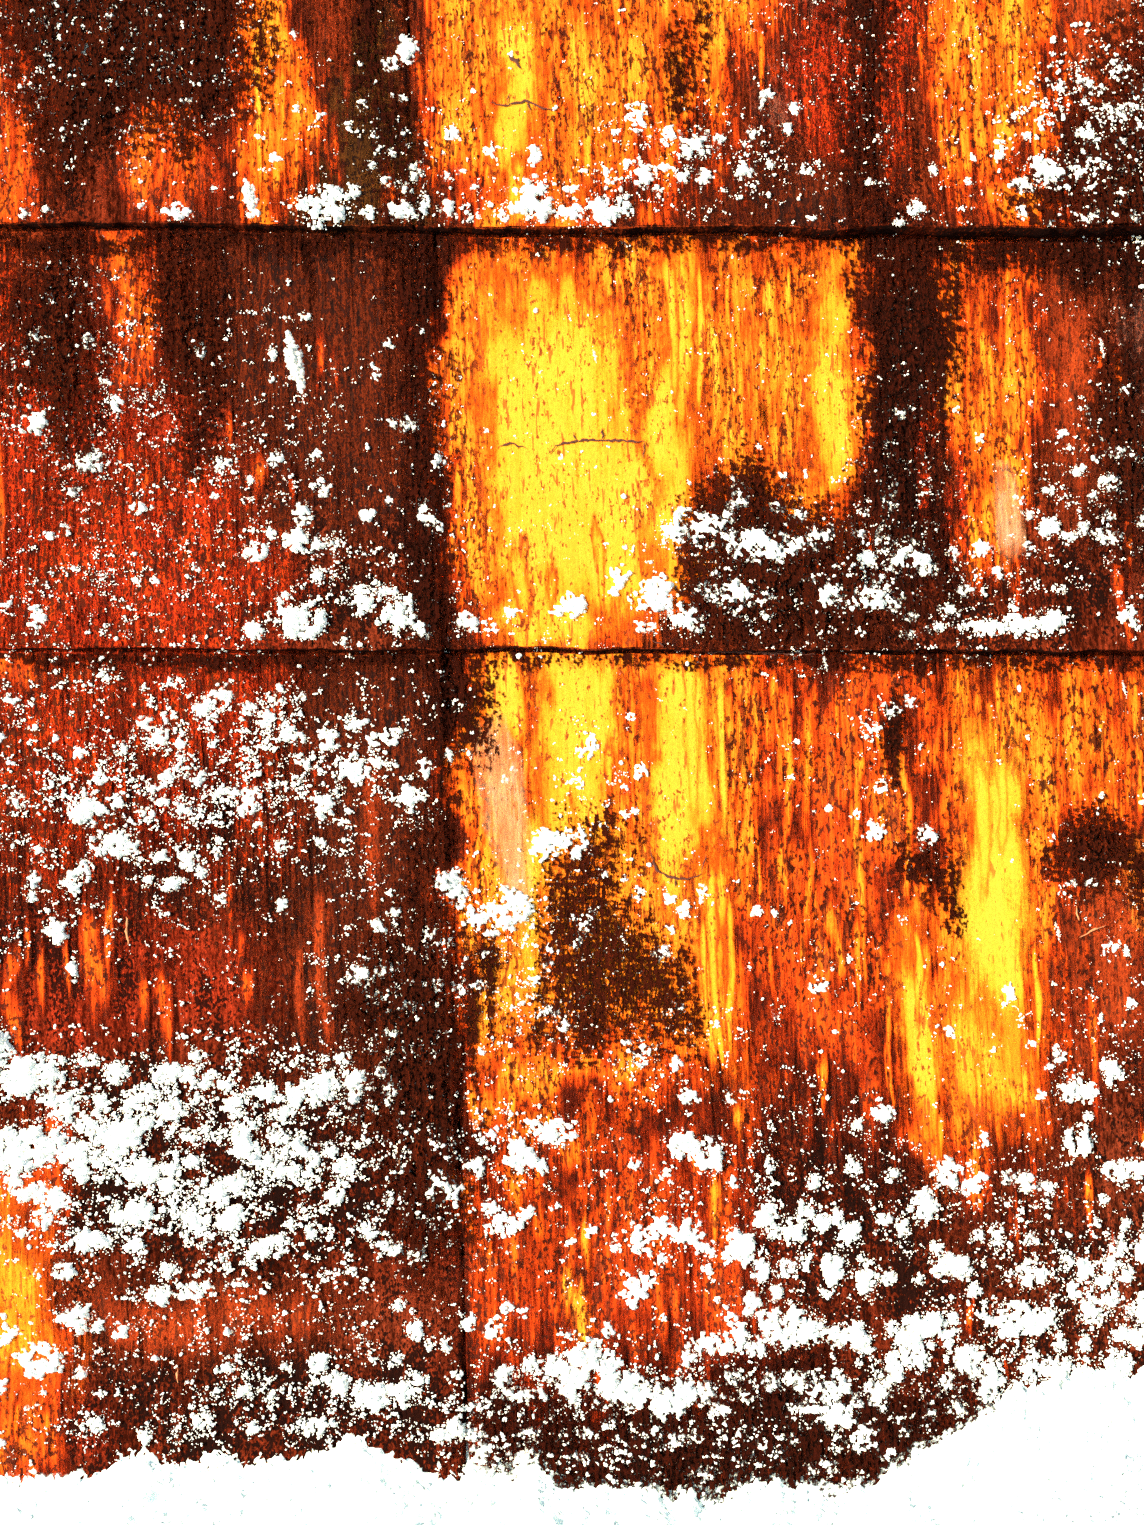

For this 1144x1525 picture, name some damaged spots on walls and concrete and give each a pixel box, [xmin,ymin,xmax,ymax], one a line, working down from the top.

corrosion [0,0,372,224]
corrosion [379,0,1144,227]
corrosion [0,230,673,649]
corrosion [660,235,889,649]
corrosion [913,239,1144,622]
corrosion [1123,618,1136,649]
corrosion [0,652,1144,1487]